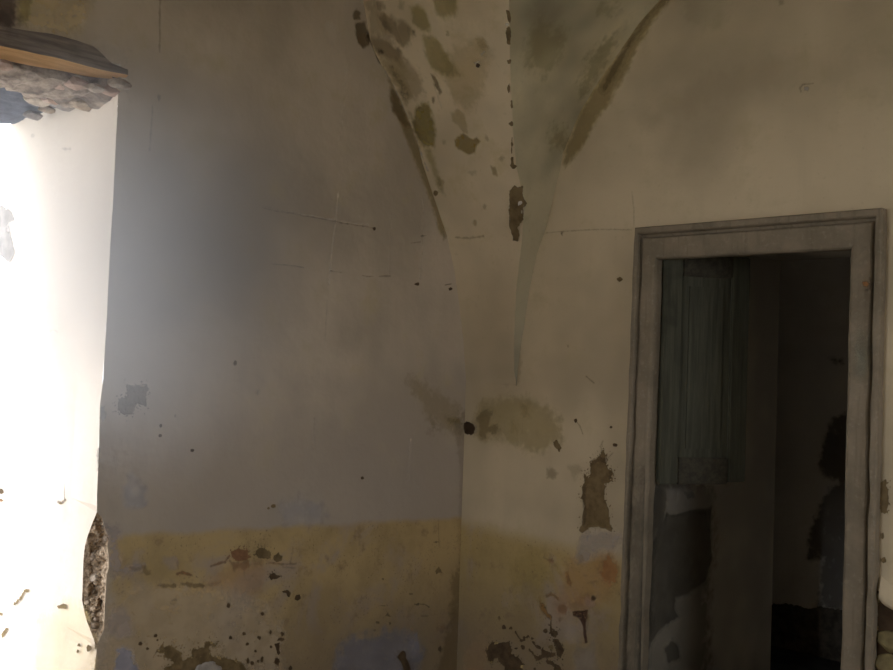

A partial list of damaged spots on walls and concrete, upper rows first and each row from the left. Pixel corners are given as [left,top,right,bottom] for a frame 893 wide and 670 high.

leakage [353,11,371,48]
spalling [0,59,132,121]
leakage [455,134,479,154]
peeling [509,185,527,241]
peeling [101,379,150,420]
peeling [577,446,616,533]
spalling [76,513,109,653]
peeling [138,630,292,670]
flaking render [485,616,564,670]